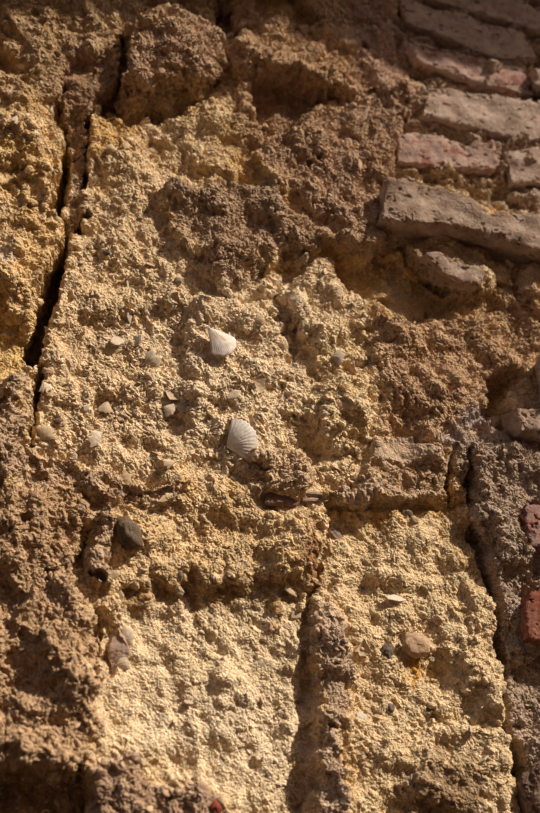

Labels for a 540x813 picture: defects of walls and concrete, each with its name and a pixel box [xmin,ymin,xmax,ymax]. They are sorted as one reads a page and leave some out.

crack [22,24,134,448]
crack [427,440,527,777]